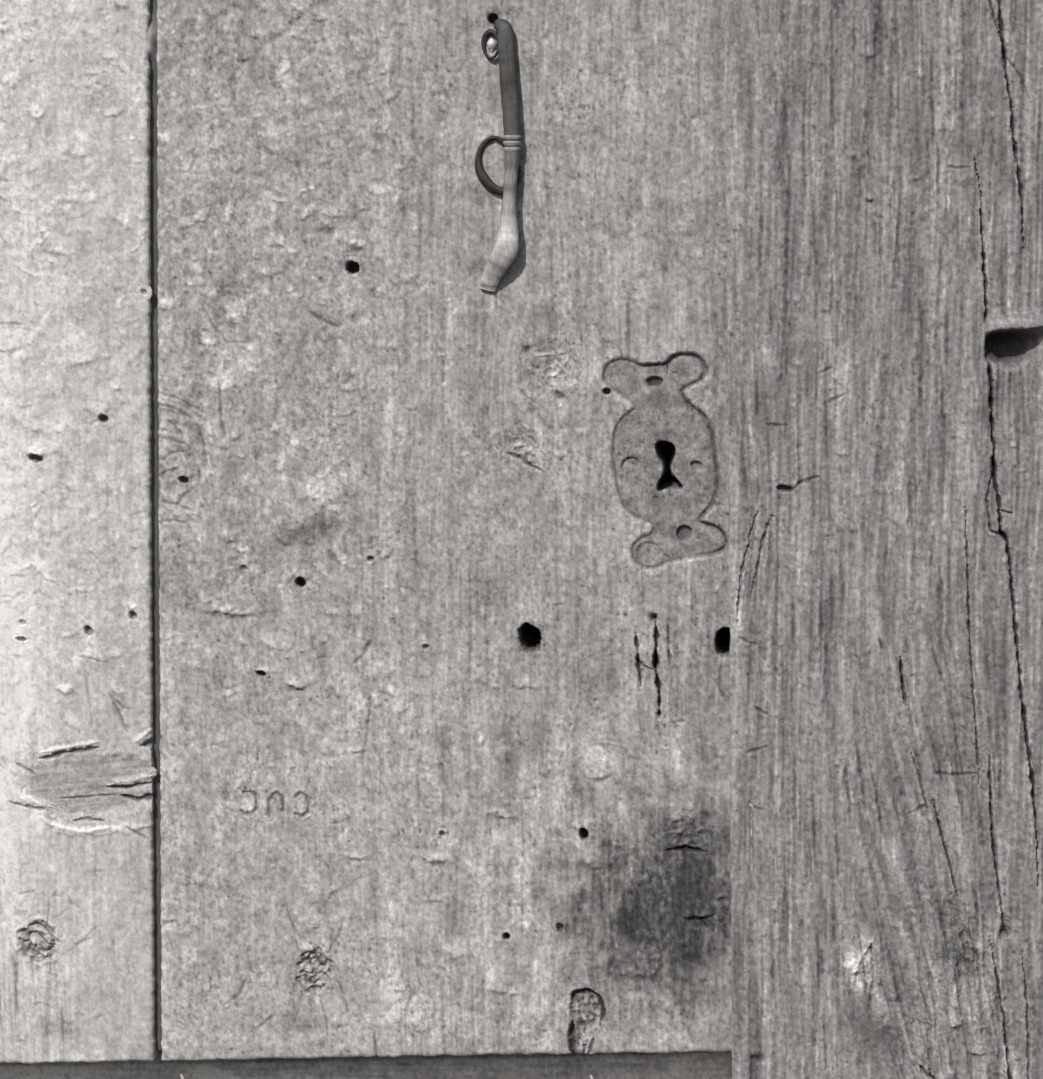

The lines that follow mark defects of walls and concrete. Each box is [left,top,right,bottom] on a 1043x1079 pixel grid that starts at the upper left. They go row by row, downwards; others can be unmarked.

crack [983,0,1035,254]
crack [959,152,1043,1079]
crack [906,747,962,901]
crack [912,1059,942,1079]